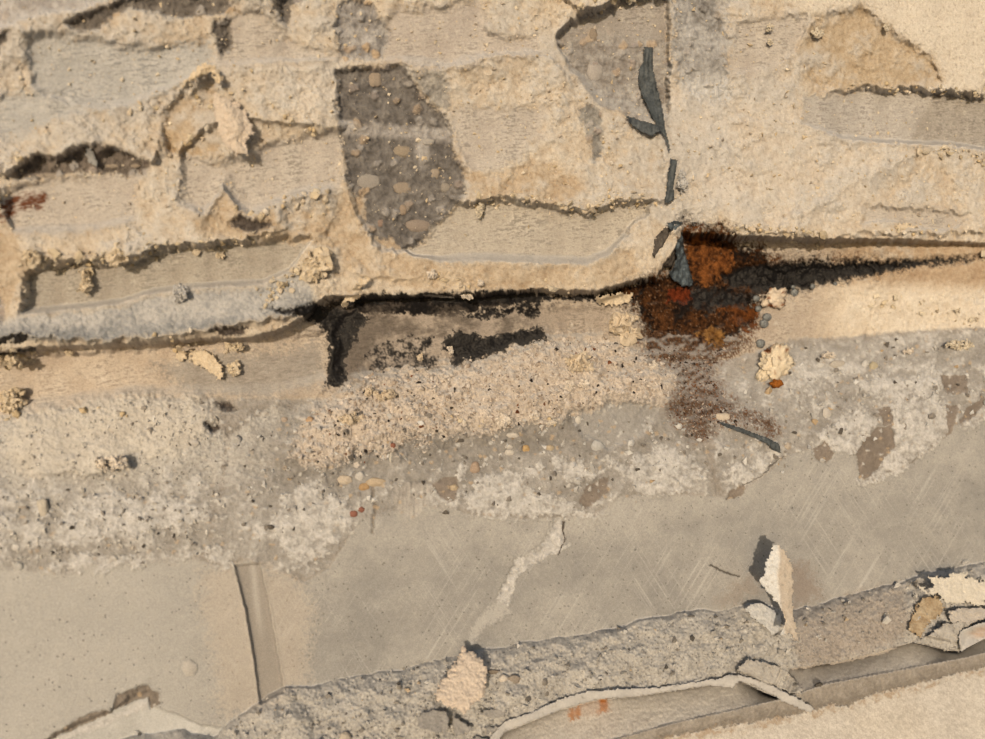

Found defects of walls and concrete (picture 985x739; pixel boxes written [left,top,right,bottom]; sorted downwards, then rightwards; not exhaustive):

spalling [0,0,985,337]
spalling [0,326,985,580]
corrosion [597,208,985,452]
crack [463,516,573,651]